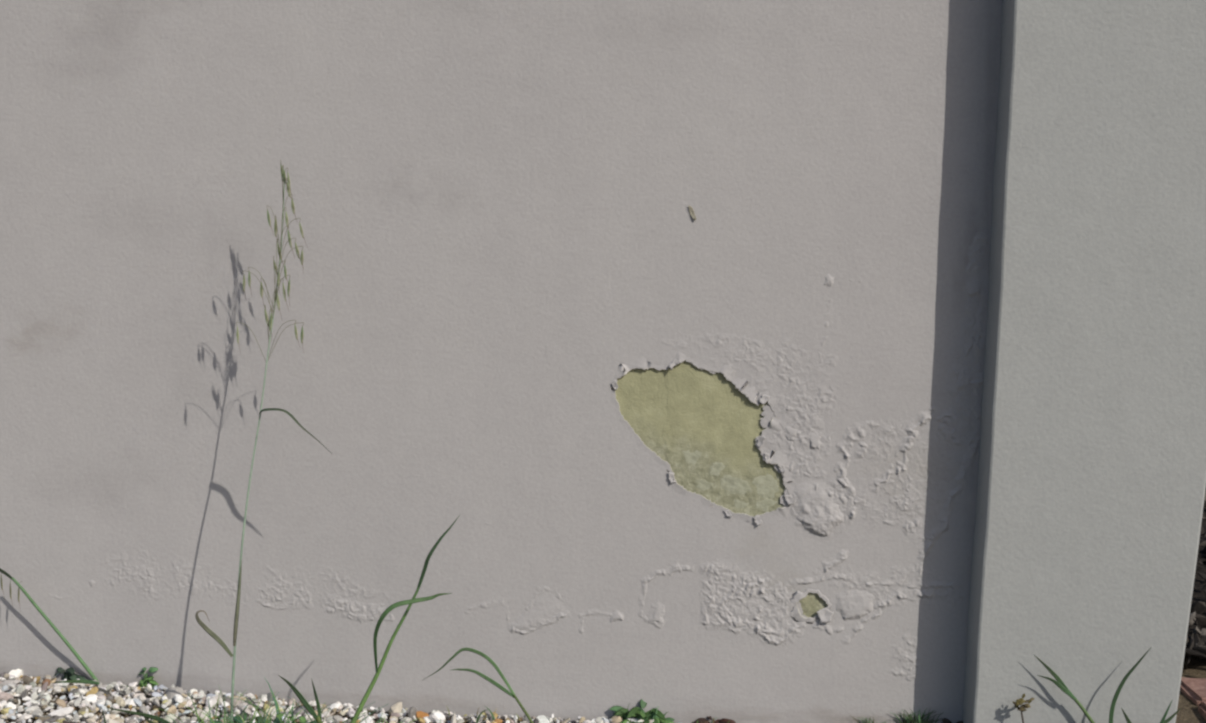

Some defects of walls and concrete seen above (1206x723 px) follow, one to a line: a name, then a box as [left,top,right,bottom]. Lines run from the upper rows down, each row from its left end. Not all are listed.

peeling [610,351,796,527]
peeling [698,558,834,647]